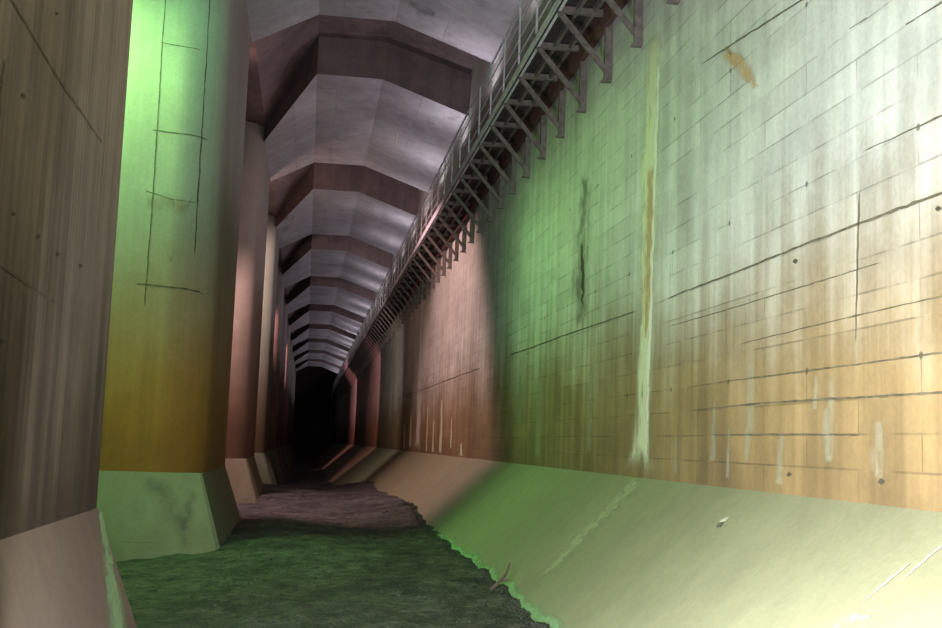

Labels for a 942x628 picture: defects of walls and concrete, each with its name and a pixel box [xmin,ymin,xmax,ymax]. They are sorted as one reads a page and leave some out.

crack [11,0,102,141]
crack [137,0,210,304]